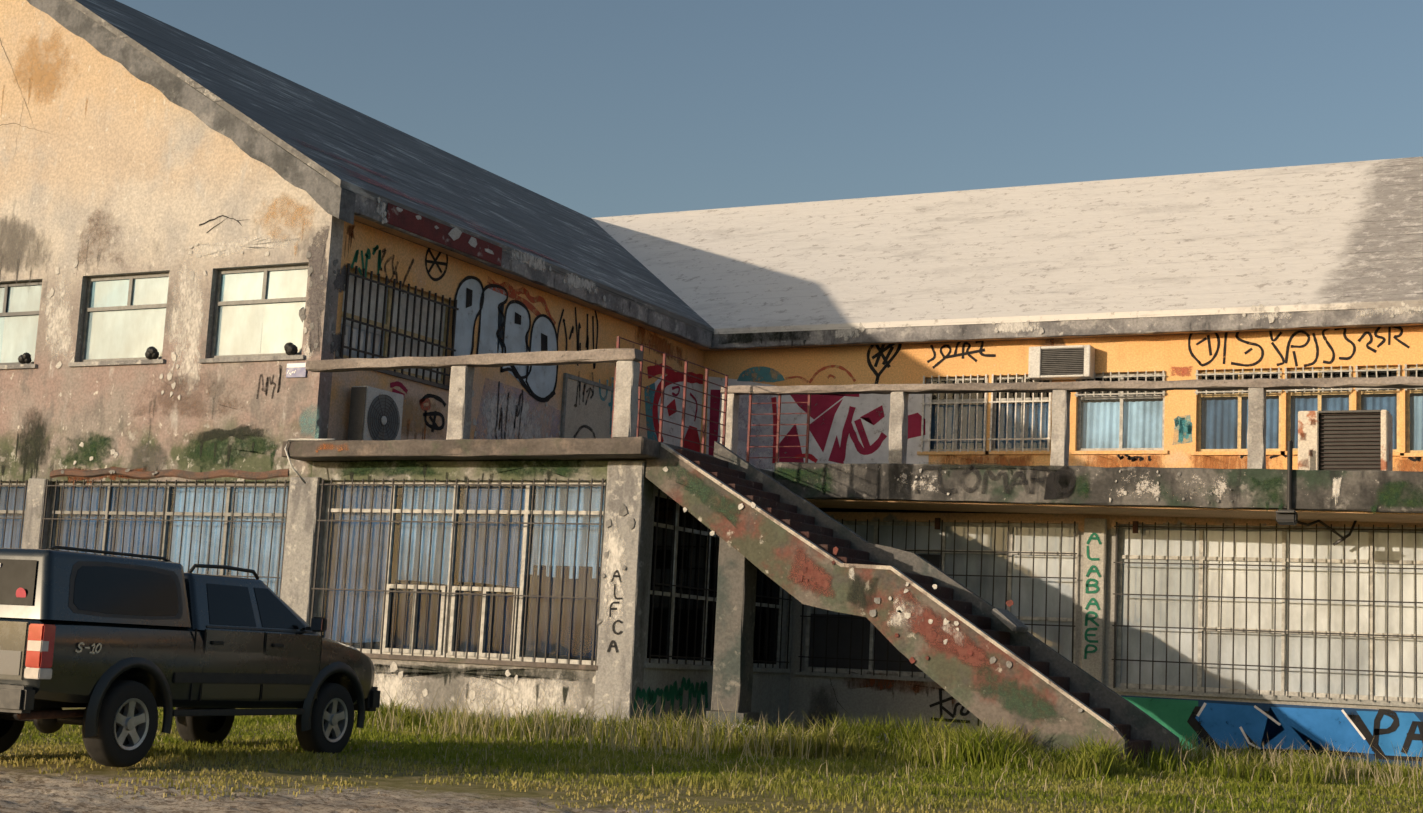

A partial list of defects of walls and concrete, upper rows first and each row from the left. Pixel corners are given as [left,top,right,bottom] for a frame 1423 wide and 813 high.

leakage [0,219,40,285]
leakage [1,415,79,496]
leakage [198,403,263,481]
leakage [1333,478,1341,504]